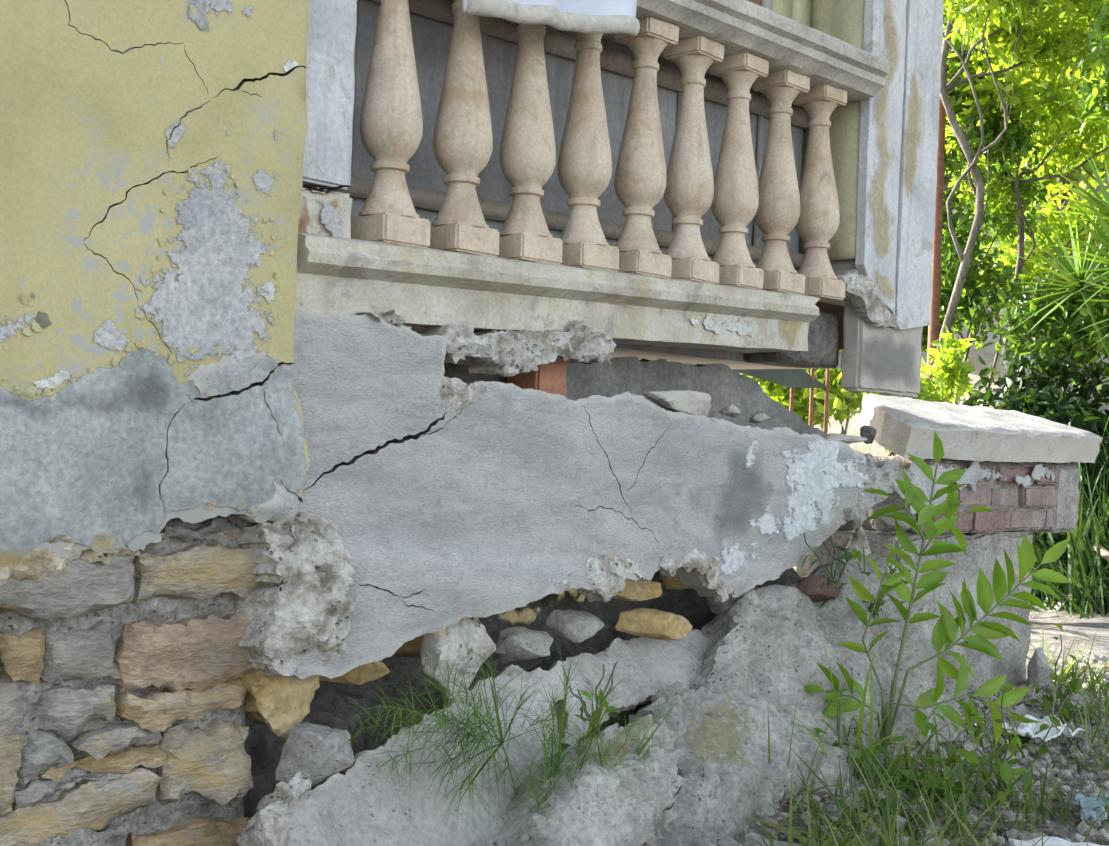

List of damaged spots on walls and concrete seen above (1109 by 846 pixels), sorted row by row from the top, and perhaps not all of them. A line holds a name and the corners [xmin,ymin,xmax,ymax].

peeling [188,0,253,31]
crack [64,0,307,353]
peeling [320,199,344,238]
flaking render [0,160,306,586]
crack [159,362,294,518]
crack [289,403,471,502]
crack [575,410,669,543]
spalling [839,453,1056,529]
spalling [234,510,357,681]
spalling [236,770,312,846]